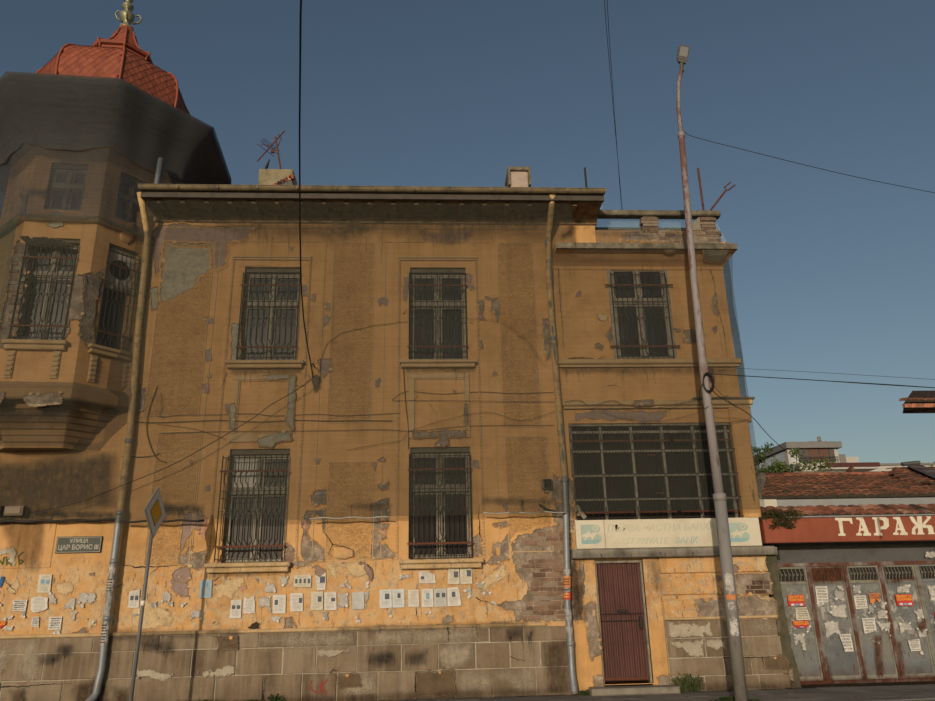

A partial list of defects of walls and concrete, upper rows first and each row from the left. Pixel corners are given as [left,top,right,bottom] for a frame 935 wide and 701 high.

flaking render [0,222,75,348]
spalling [63,269,107,350]
spalling [133,222,258,311]
spalling [476,296,501,322]
spalling [21,391,63,407]
leakage [0,455,112,520]
peeling [130,597,174,631]
spalling [283,480,395,582]
flaking render [472,477,602,662]
spalling [669,574,726,658]
spalling [733,556,779,619]